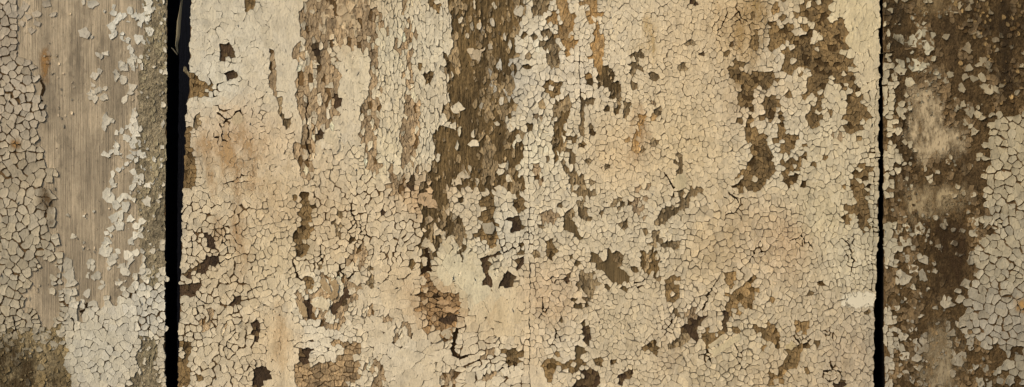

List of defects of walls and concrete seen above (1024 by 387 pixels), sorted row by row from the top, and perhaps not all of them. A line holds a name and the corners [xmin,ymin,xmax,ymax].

peeling [0,0,168,387]
crack [0,0,170,387]
crack [178,0,903,387]
peeling [292,0,820,387]
peeling [723,0,1024,387]
crack [955,111,1024,385]